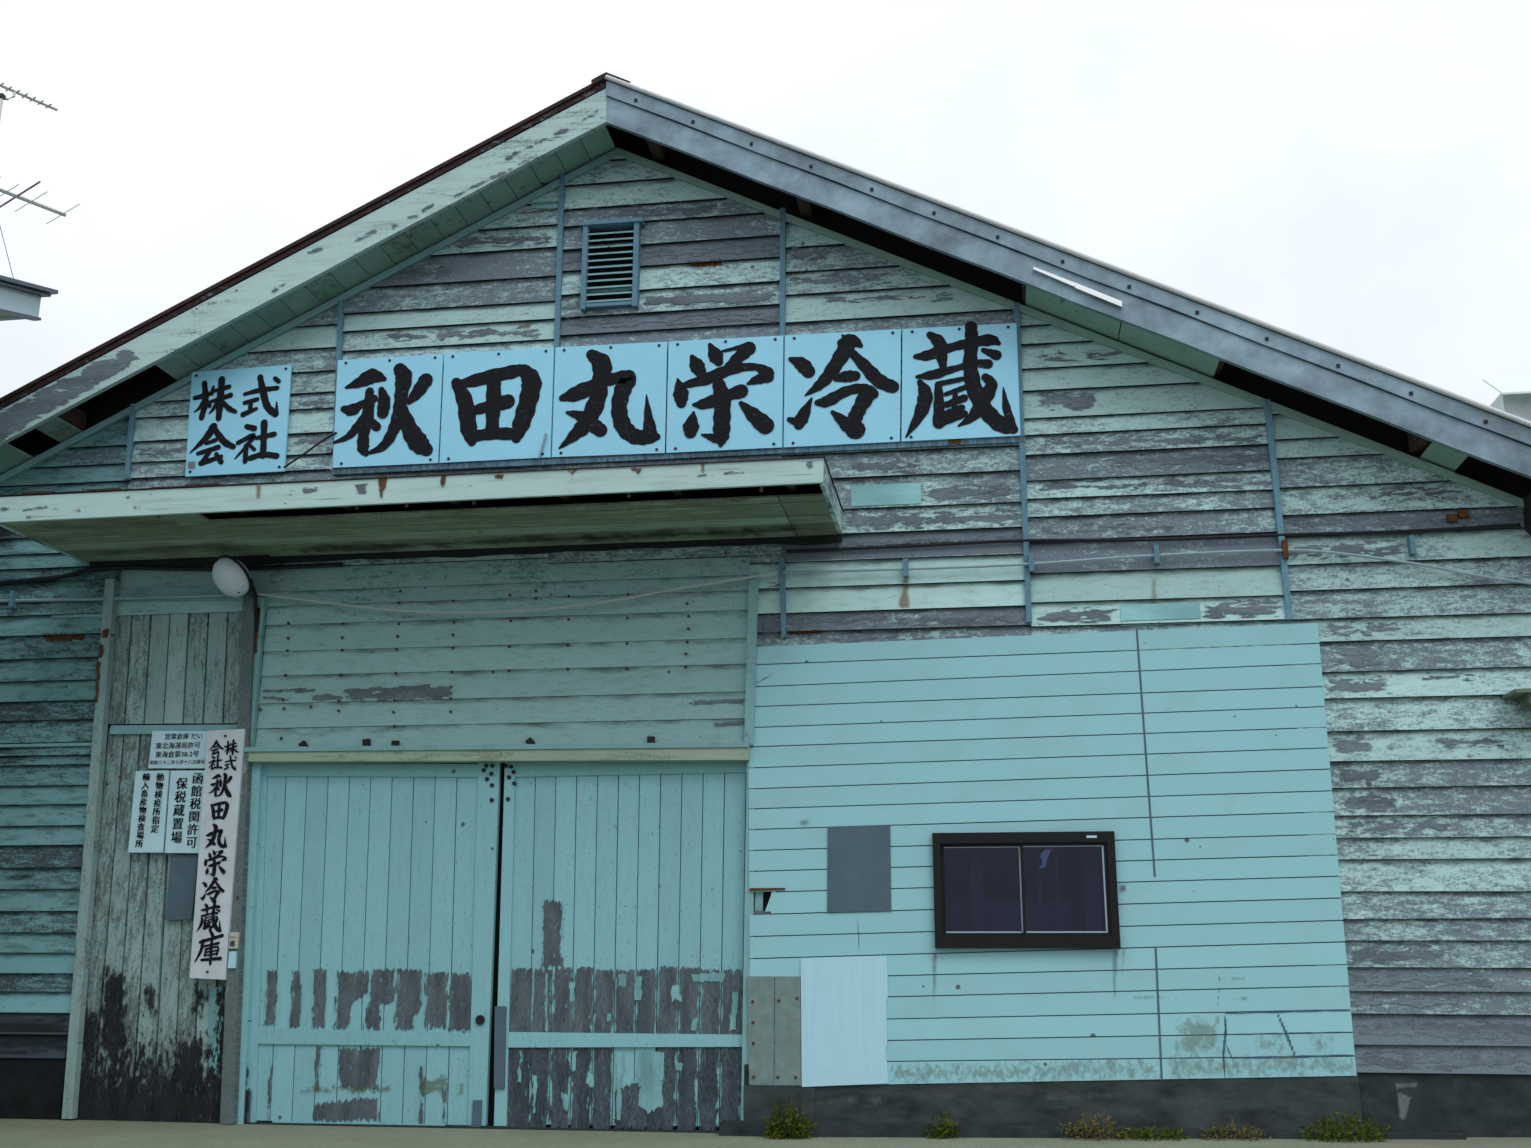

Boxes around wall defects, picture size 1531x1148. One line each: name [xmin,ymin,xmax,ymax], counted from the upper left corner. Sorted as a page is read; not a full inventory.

peeling [363,233,552,282]
peeling [386,327,541,342]
peeling [0,350,140,442]
peeling [1037,391,1097,411]
peeling [1203,599,1281,622]
peeling [262,684,453,702]
peeling [1325,622,1401,695]
peeling [1436,736,1504,749]
peeling [1331,734,1449,834]
water stain [0,964,226,1123]
peeling [263,968,472,1124]
peeling [506,899,743,1131]